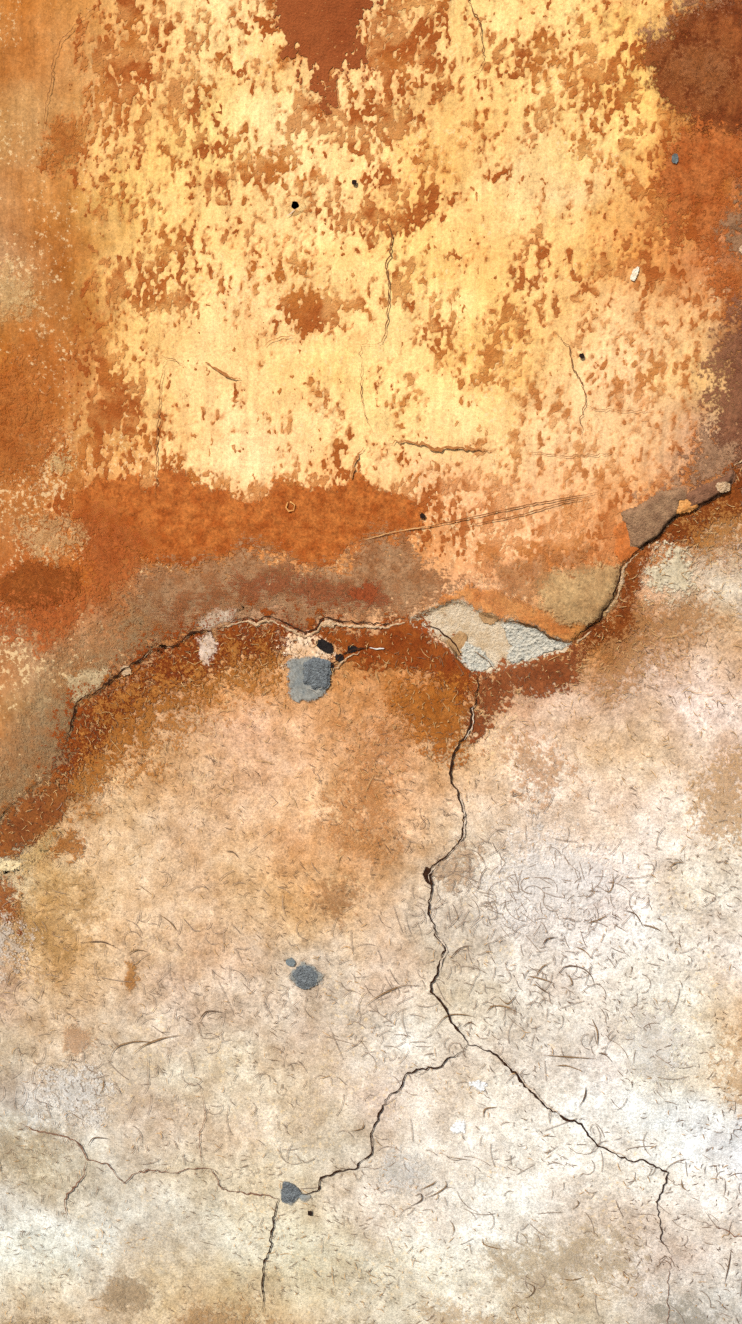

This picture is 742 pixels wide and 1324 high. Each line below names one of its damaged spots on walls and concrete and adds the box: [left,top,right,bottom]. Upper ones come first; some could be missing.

peeling [35,0,742,674]
crack [572,460,742,643]
crack [0,616,742,1324]